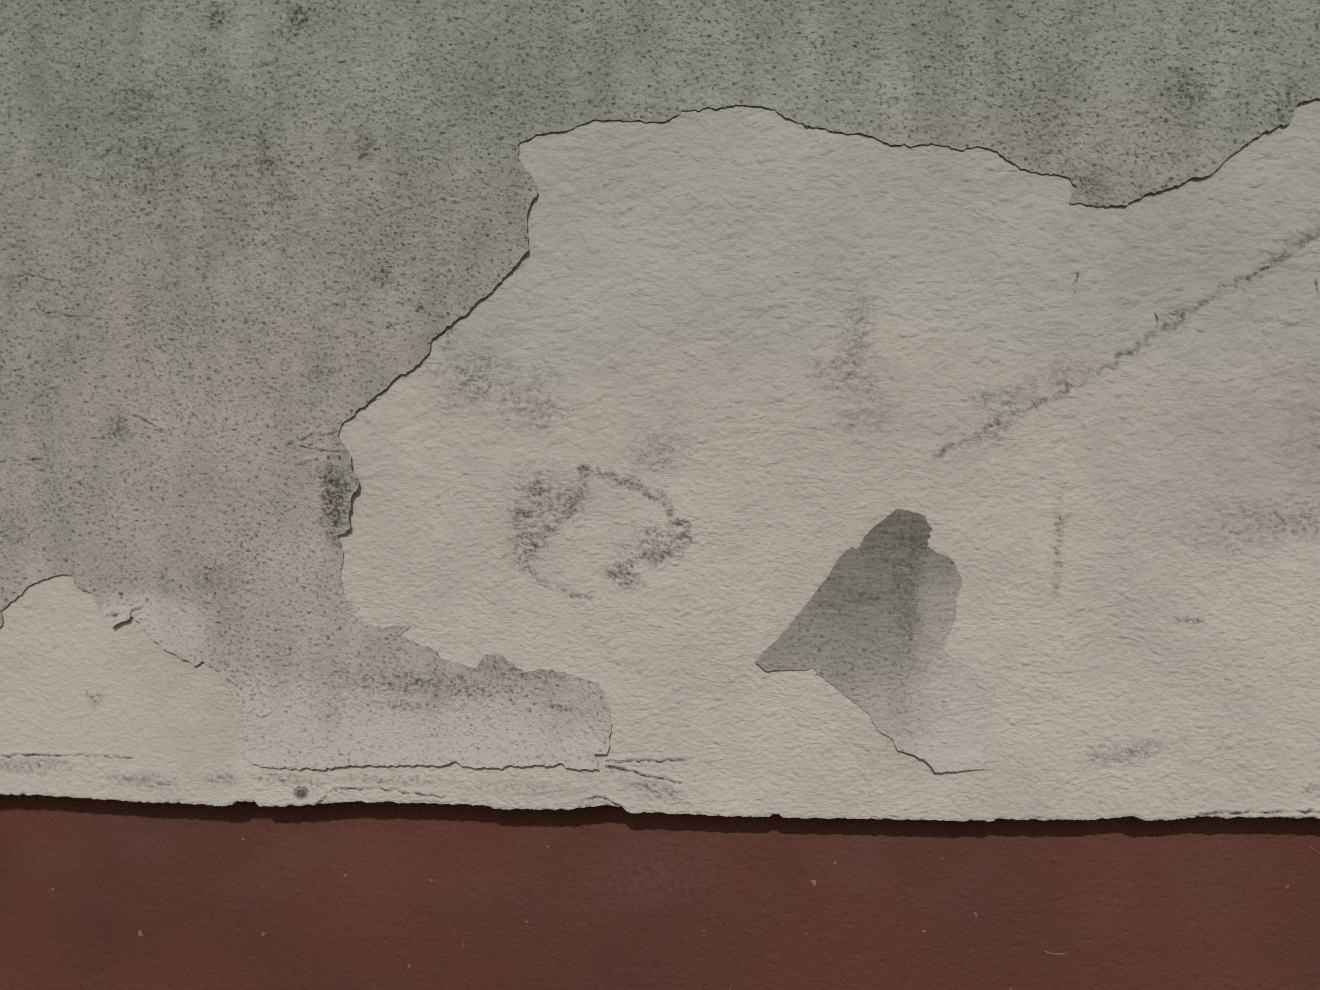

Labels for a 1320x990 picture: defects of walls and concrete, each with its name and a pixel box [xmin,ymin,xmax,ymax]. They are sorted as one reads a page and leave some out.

peeling [0,81,1320,822]